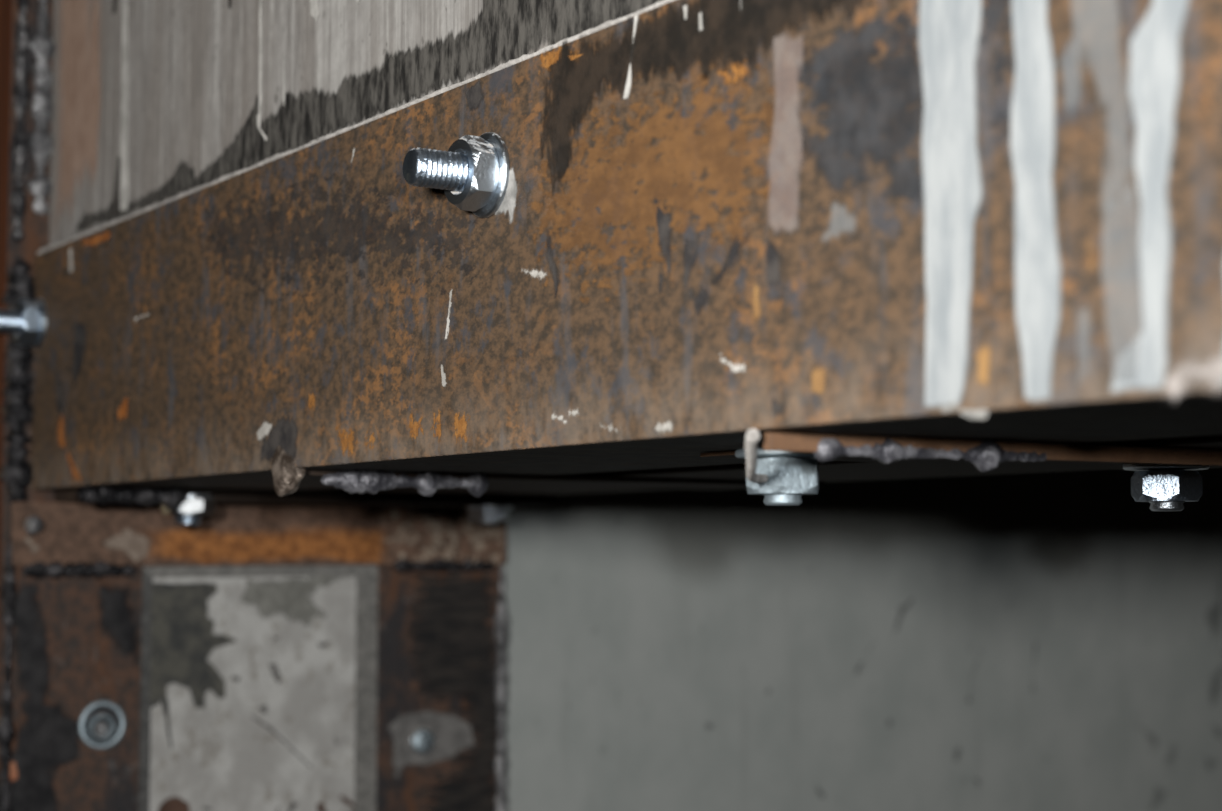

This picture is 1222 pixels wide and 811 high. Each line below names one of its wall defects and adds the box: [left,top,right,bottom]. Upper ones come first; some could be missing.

rust [540,47,583,71]
peeling [74,0,663,234]
rust [527,59,790,303]
leakage [1111,0,1189,392]
rust [812,368,825,393]
rust [978,347,990,383]
rust [409,412,470,442]
peeling [150,583,240,748]
rust [10,761,18,781]
rust [159,797,190,811]